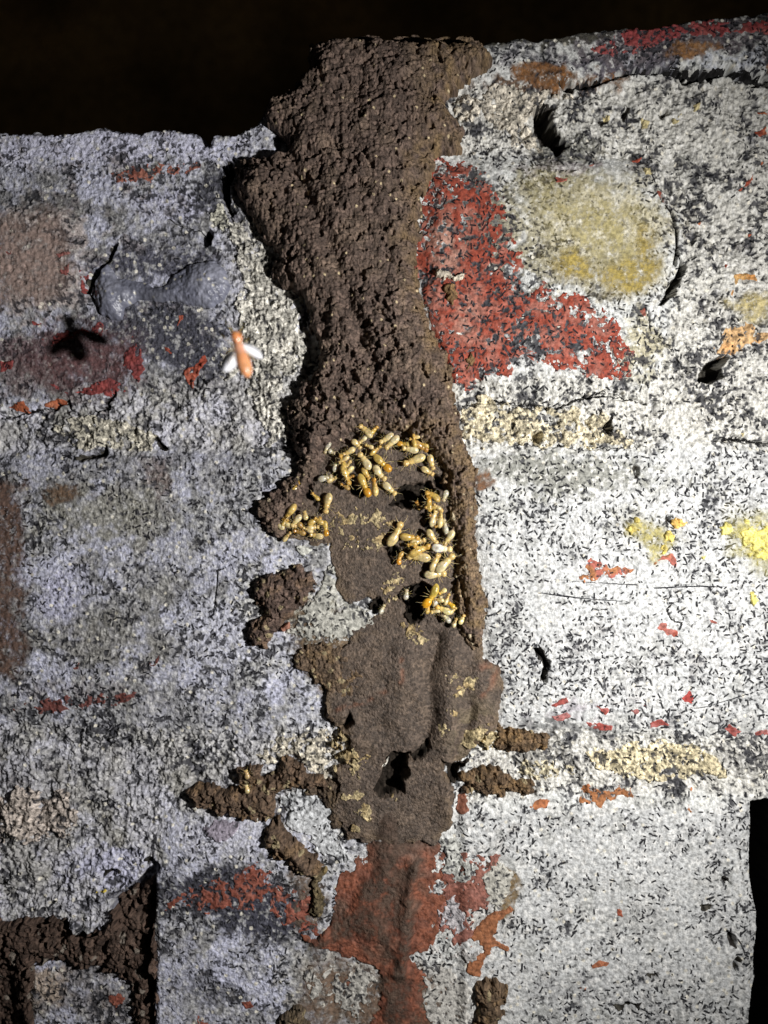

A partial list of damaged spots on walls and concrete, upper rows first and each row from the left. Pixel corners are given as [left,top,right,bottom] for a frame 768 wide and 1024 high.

peeling [414,157,638,451]
crack [663,202,682,267]